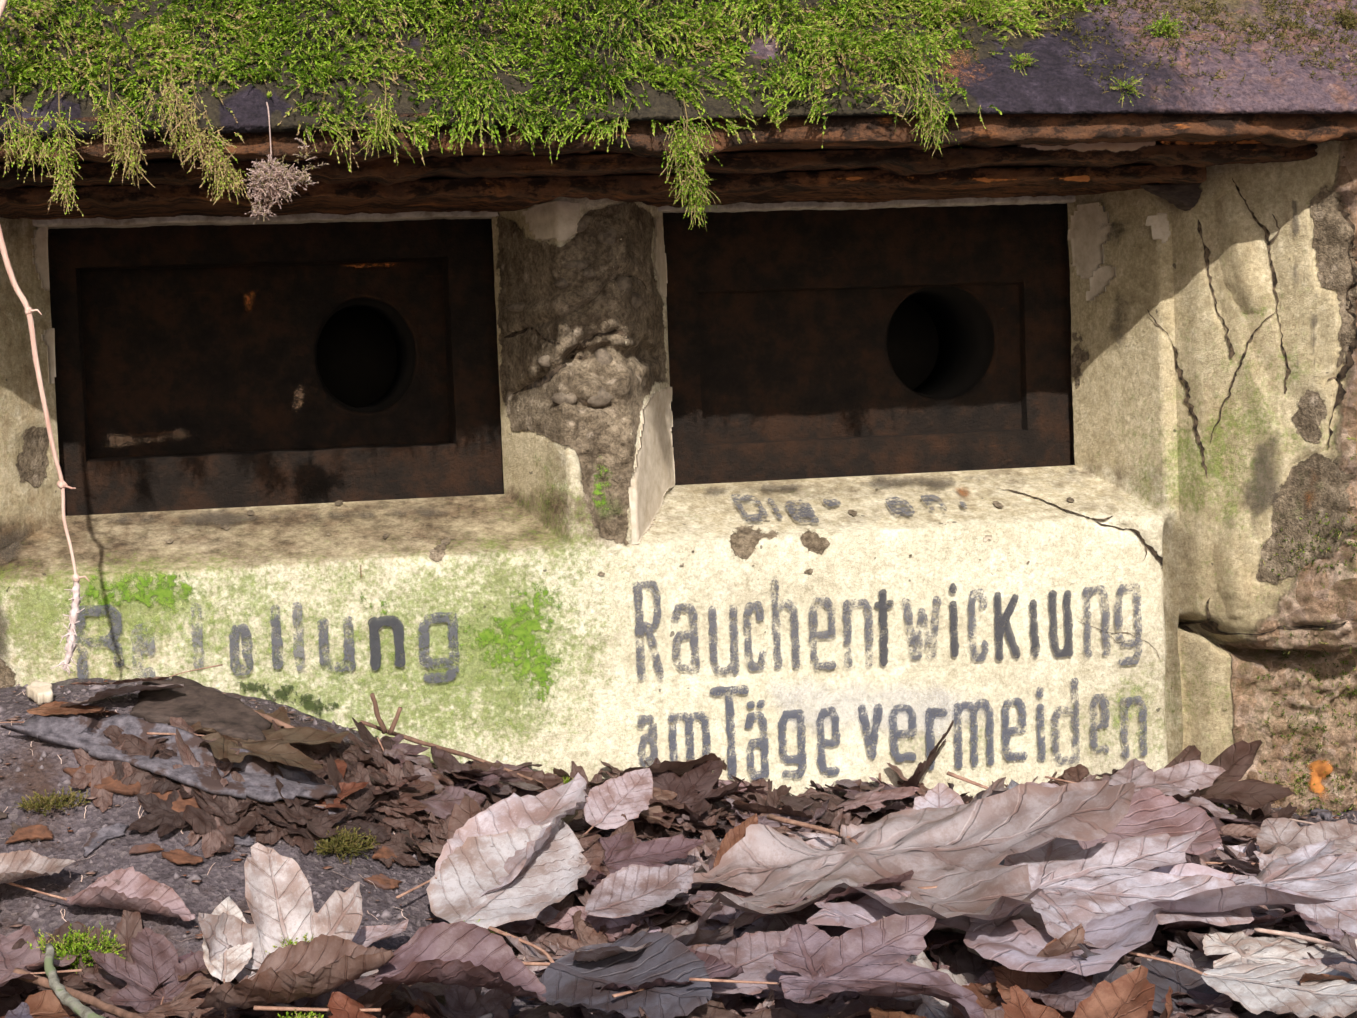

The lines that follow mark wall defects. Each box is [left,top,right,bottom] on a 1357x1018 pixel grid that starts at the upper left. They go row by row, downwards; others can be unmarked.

spalling [16,426,49,487]
spalling [495,201,675,546]
crack [996,487,1163,569]
crack [1147,178,1291,476]
crack [1178,598,1348,635]
spalling [1256,388,1357,585]
spalling [1307,185,1357,367]
crack [1327,200,1357,448]